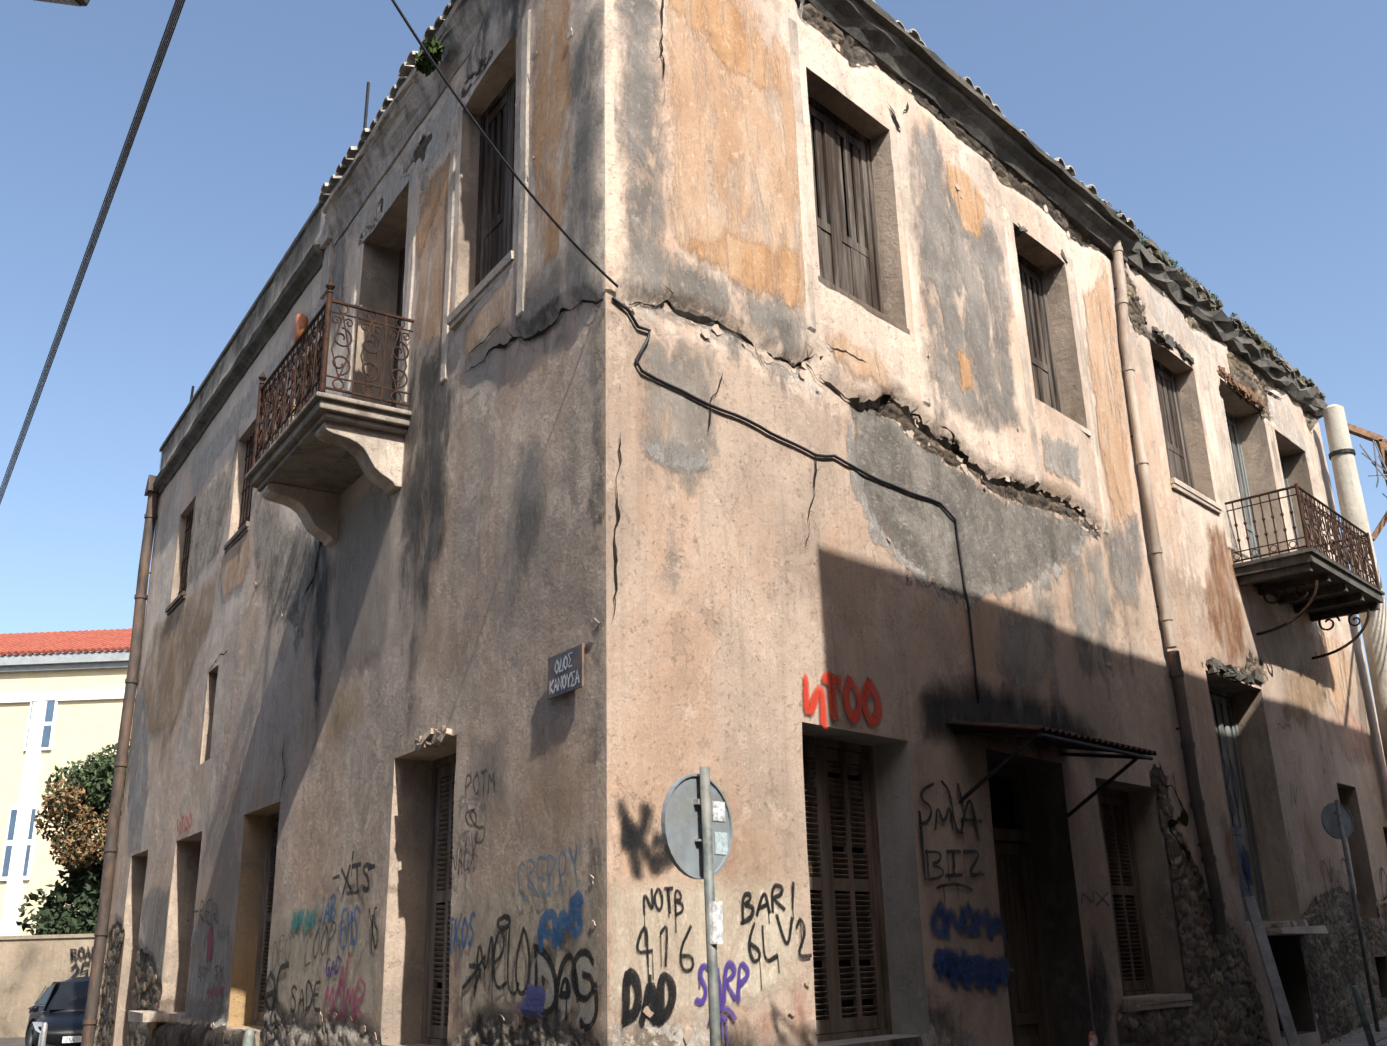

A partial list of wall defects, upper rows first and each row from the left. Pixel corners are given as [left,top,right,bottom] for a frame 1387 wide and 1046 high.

peeling [530,0,573,265]
leakage [515,0,808,356]
crack [659,0,667,108]
peeling [666,0,812,309]
peeling [802,2,1317,522]
leakage [404,347,451,611]
leakage [515,436,545,543]
crack [466,279,1099,533]
spalling [832,333,1101,624]
leakage [310,541,329,716]
spalling [1116,761,1272,1046]